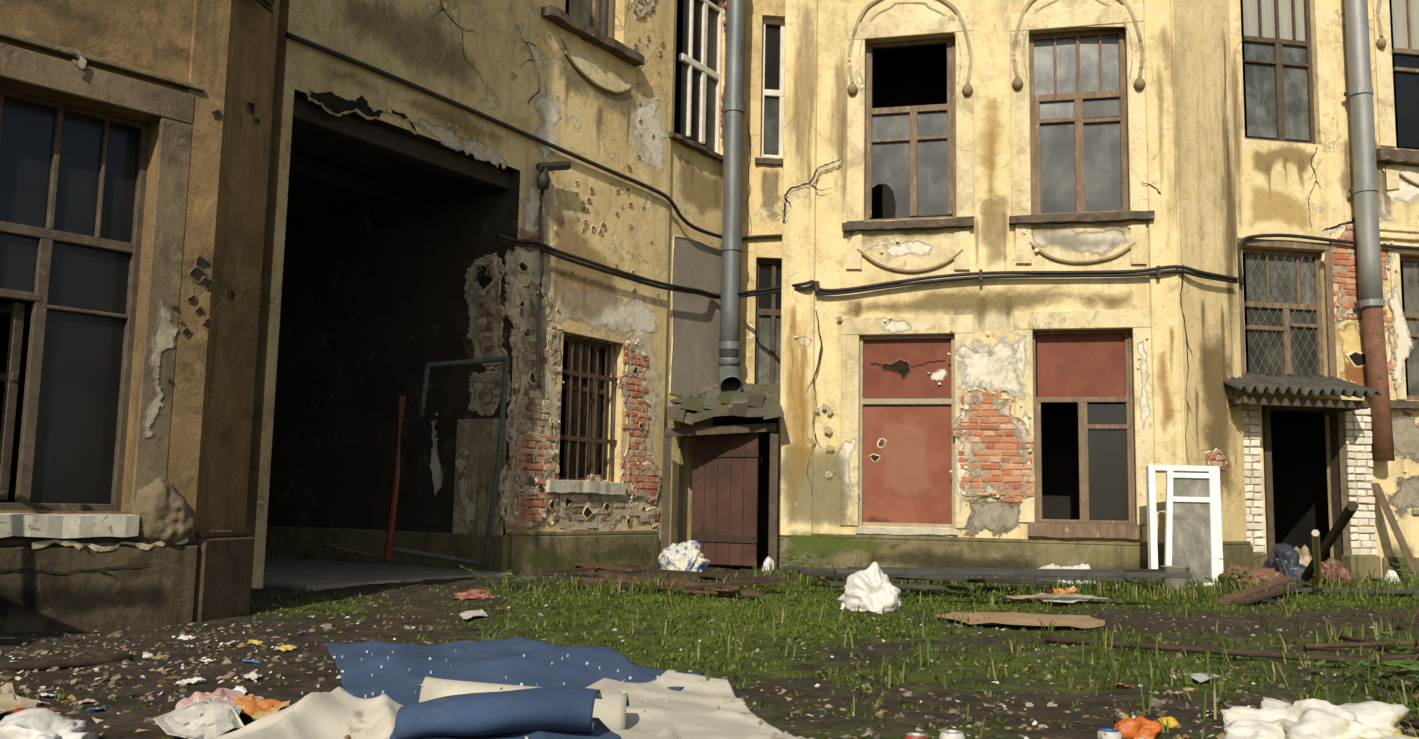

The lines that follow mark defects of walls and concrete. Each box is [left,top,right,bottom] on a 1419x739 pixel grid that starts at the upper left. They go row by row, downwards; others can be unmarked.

spalling [307,89,509,169]
peeling [535,73,562,162]
peeling [574,0,668,242]
crack [745,123,841,234]
leakage [1224,46,1312,185]
spalling [142,255,236,438]
flaking render [464,181,722,534]
flaking render [1321,223,1366,383]
peeling [1380,241,1414,389]
peeling [430,412,444,498]
flaking render [927,328,1035,537]
spalling [1388,409,1419,517]